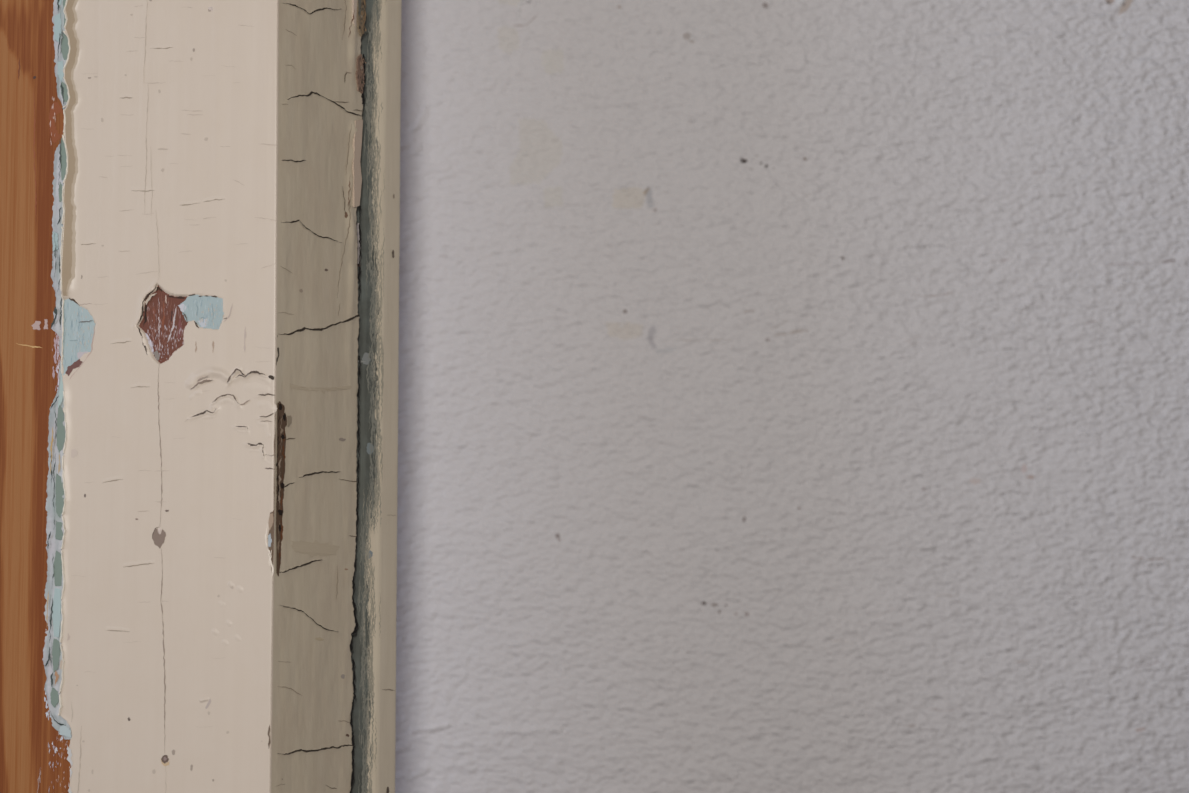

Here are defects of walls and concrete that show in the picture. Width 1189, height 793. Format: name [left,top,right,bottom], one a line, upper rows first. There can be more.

peeling [58,391,67,715]
peeling [60,0,96,374]
peeling [139,285,188,363]
crack [45,1,395,793]
spalling [265,401,287,576]